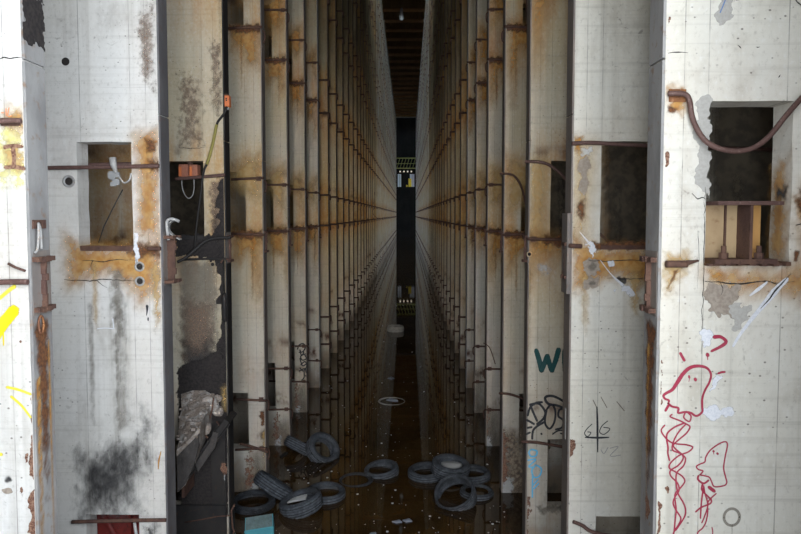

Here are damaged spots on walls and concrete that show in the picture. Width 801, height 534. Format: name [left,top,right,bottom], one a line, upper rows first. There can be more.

flaking render [714,0,737,26]
rust [469,0,545,114]
rust [137,133,159,233]
rust [472,164,544,228]
flaking render [577,147,592,195]
flaking render [693,94,713,199]
rust [68,242,161,316]
rust [468,226,525,268]
rust [574,239,646,306]
flaking render [703,281,752,332]
rust [712,268,801,295]
rust [645,320,656,455]